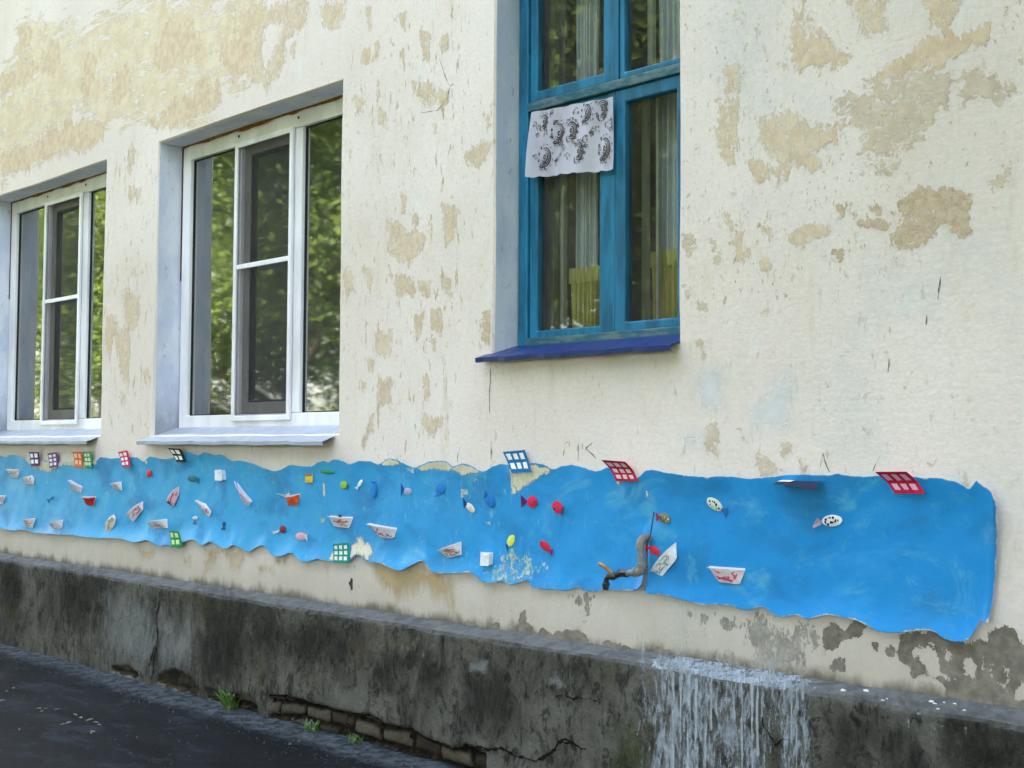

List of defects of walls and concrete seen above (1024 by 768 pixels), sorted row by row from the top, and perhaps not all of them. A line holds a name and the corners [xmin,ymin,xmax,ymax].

peeling [0,0,346,435]
peeling [341,1,492,459]
peeling [681,0,1023,312]
crack [269,694,586,762]
water stain [639,643,822,768]
peeling [687,609,1024,709]